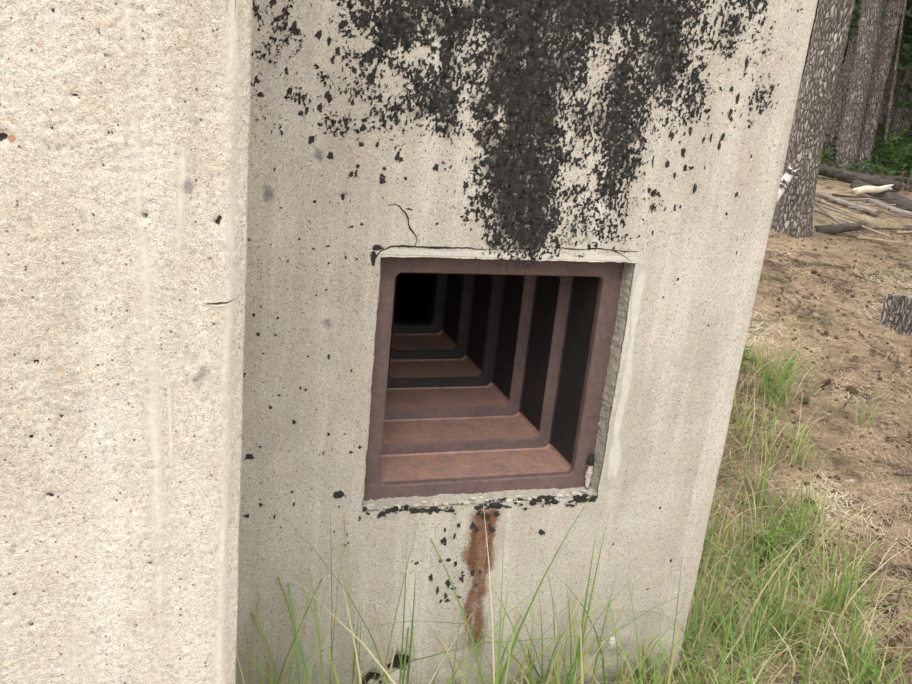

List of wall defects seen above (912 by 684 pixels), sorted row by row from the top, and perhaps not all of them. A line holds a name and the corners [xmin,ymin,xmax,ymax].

damp [474,0,675,270]
crack [371,204,638,262]
corrosion [464,510,496,647]